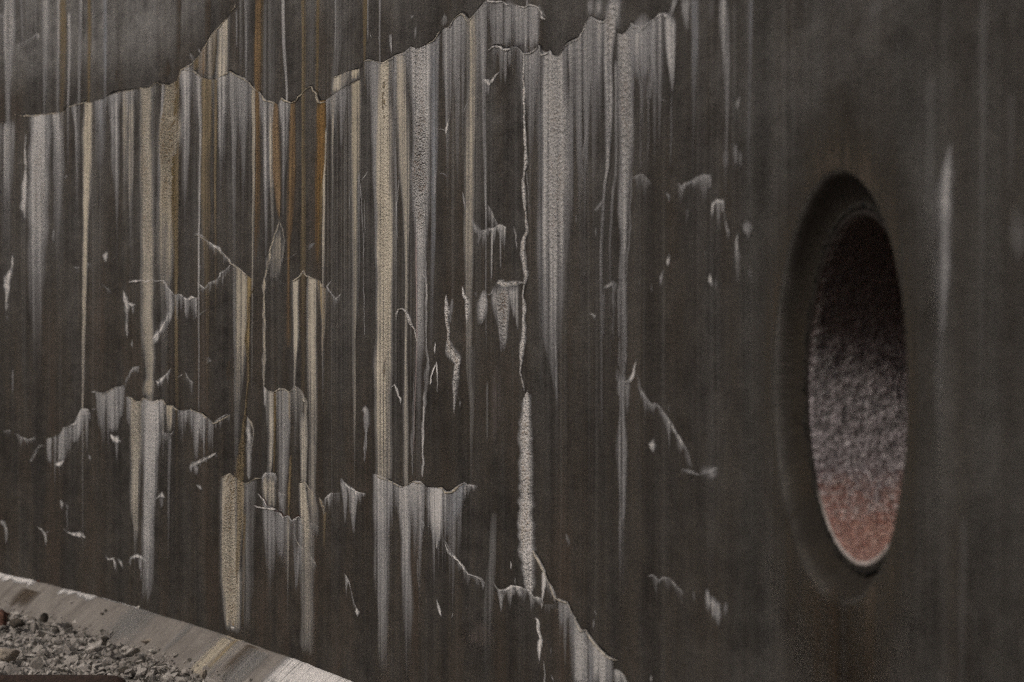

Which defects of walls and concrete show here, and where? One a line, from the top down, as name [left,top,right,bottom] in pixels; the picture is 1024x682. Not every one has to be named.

leakage [1,0,14,97]
leakage [35,0,82,86]
leakage [0,124,14,181]
leakage [4,254,13,308]
leakage [30,87,172,580]
corrosion [236,0,304,482]
corrosion [317,100,326,280]
crack [14,0,670,389]
leakage [181,0,697,682]
leakage [0,573,38,605]
leakage [58,589,152,634]
crack [445,545,616,660]